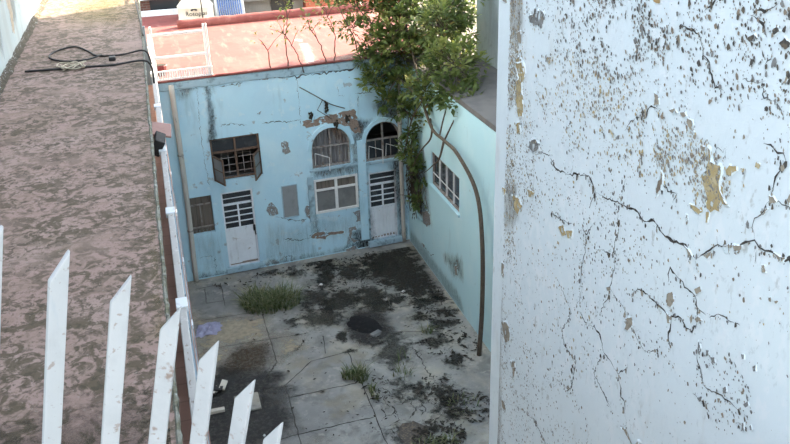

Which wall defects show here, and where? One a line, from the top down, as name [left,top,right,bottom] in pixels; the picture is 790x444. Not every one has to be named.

spalling [302,109,361,134]
spalling [266,202,279,216]
peeling [498,0,790,444]
crack [535,143,790,429]
damp [199,319,264,362]